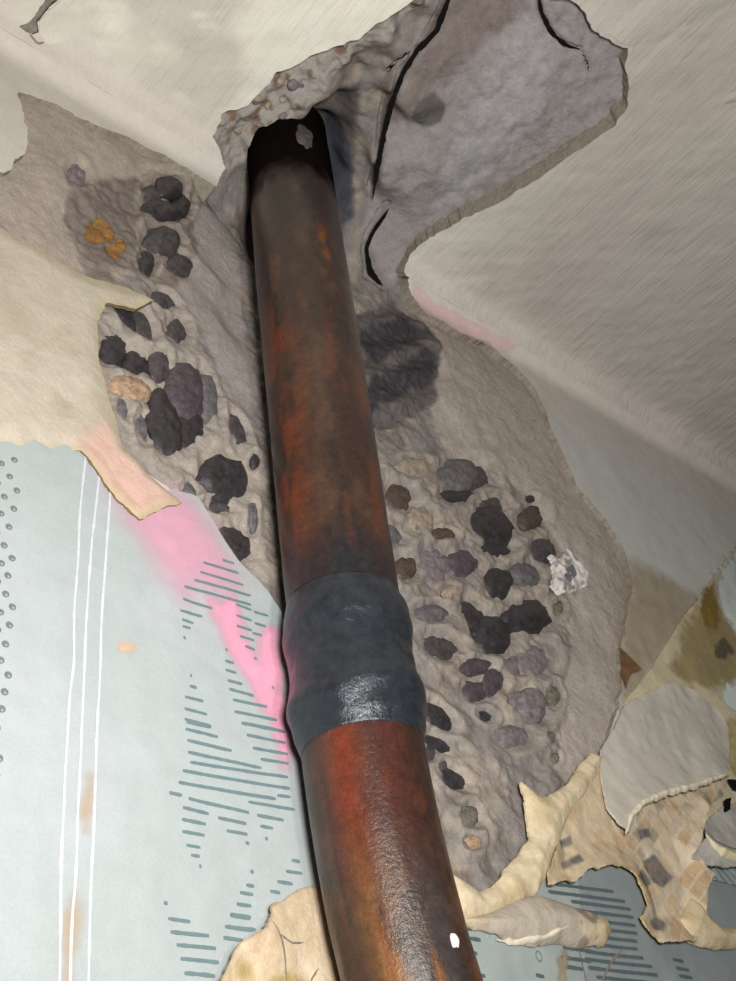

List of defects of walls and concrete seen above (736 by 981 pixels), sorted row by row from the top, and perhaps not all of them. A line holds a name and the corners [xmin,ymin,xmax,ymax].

crack [19,0,86,46]
crack [538,0,589,71]
water stain [413,94,444,125]
crack [365,0,450,286]
rust [85,218,126,259]
water stain [360,317,428,361]
spalling [0,0,628,892]